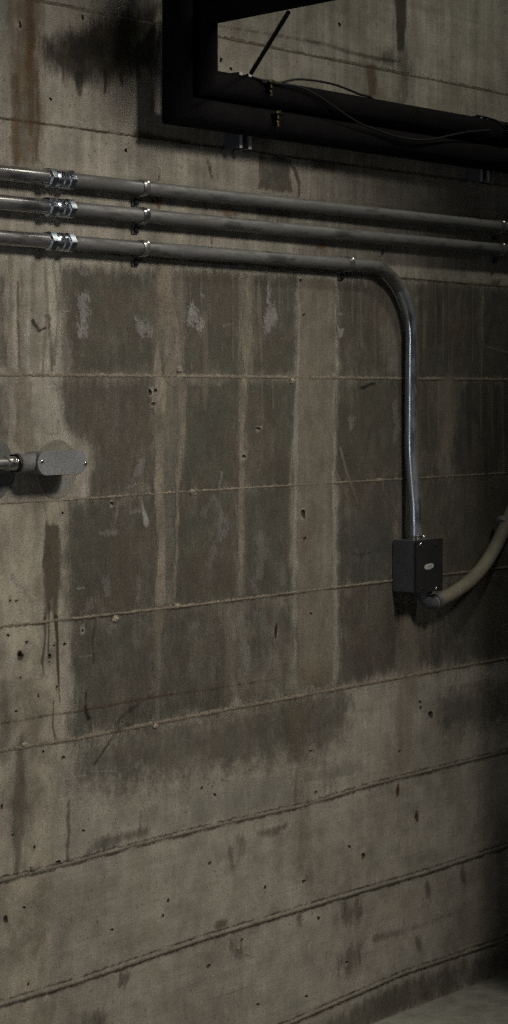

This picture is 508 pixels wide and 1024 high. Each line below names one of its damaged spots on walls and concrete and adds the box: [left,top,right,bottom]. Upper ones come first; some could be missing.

water stain [0,258,508,1024]